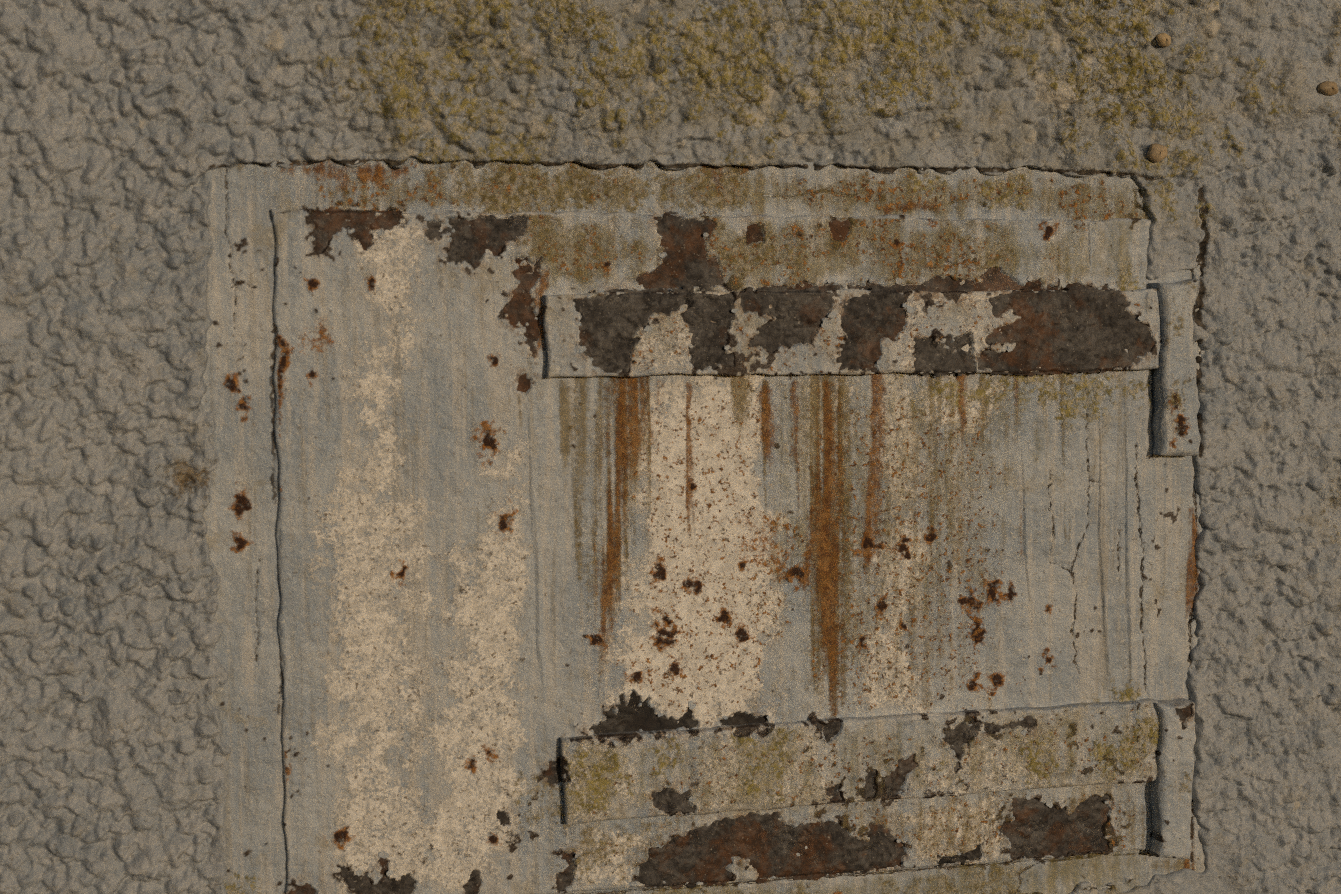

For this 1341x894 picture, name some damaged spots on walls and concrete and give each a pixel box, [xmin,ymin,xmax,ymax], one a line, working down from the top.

peeling [289,884,316,894]
peeling [307,207,543,894]
rust [560,302,1026,806]
peeling [544,211,1155,891]
rust [843,707,1159,863]